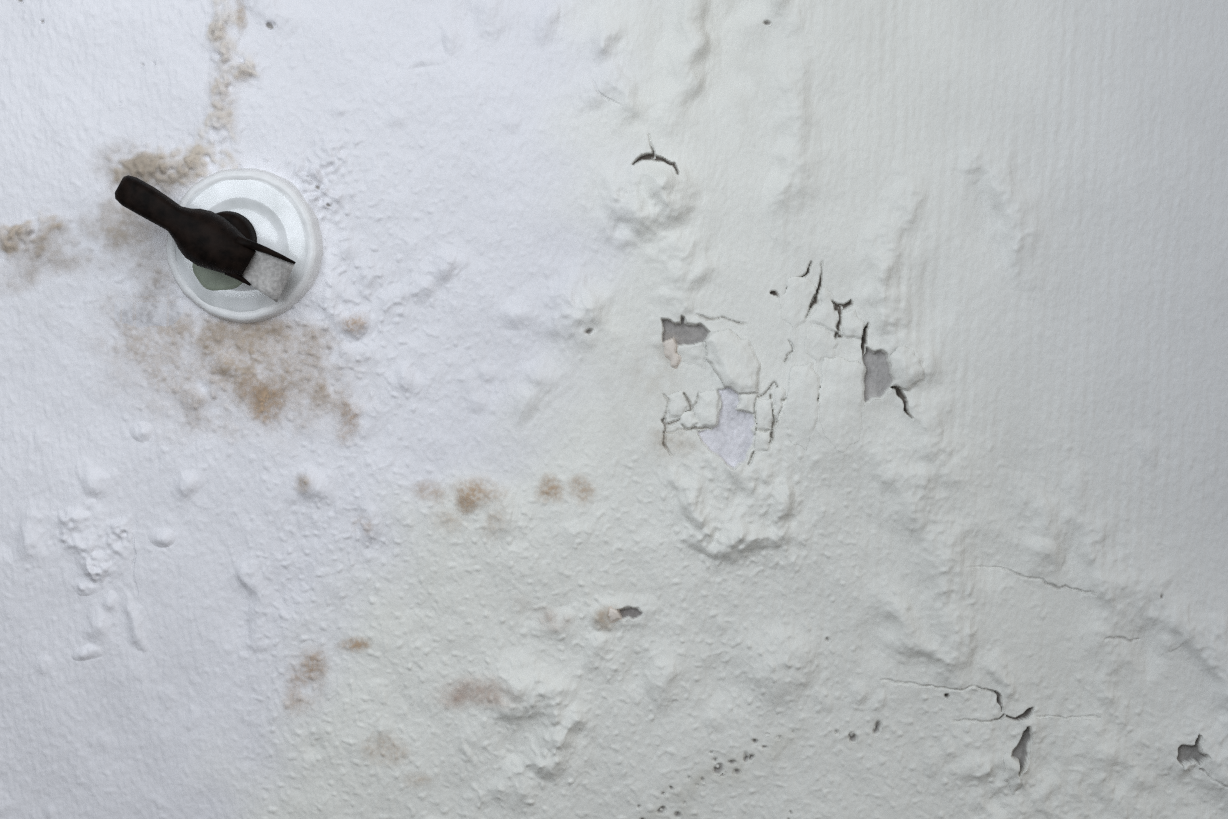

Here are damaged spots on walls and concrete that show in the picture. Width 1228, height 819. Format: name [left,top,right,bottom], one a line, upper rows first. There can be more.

crack [632,135,679,175]
damp [200,325,279,396]
peeling [661,277,925,471]
crack [881,680,1102,724]
peeling [1004,727,1033,794]
peeling [1177,735,1211,771]